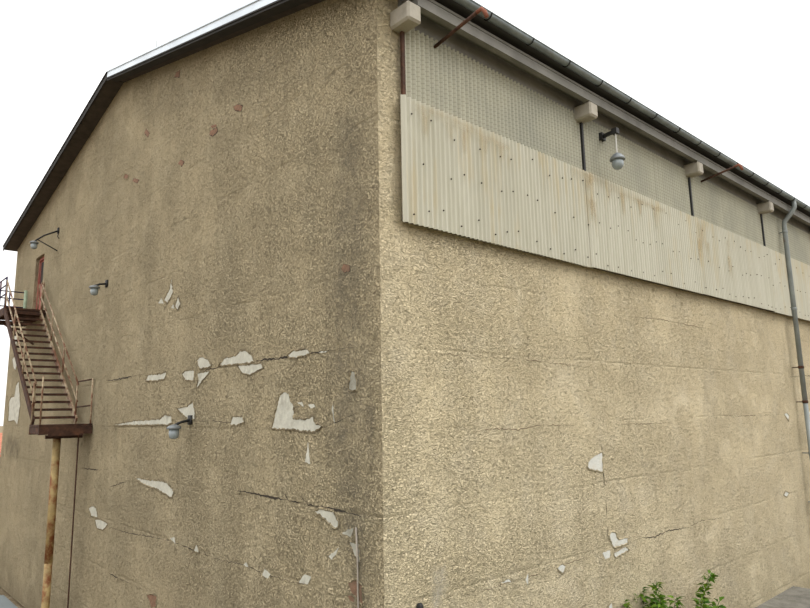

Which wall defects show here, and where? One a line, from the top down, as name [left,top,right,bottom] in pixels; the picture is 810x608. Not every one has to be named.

flaking render [158,277,181,311]
flaking render [145,371,167,383]
flaking render [181,348,264,389]
flaking render [114,400,196,427]
flaking render [229,414,246,427]
flaking render [271,390,323,435]
flaking render [586,451,604,474]
flaking render [133,476,175,499]
crack [239,488,371,519]
flaking render [88,505,108,531]
flaking render [602,530,629,559]